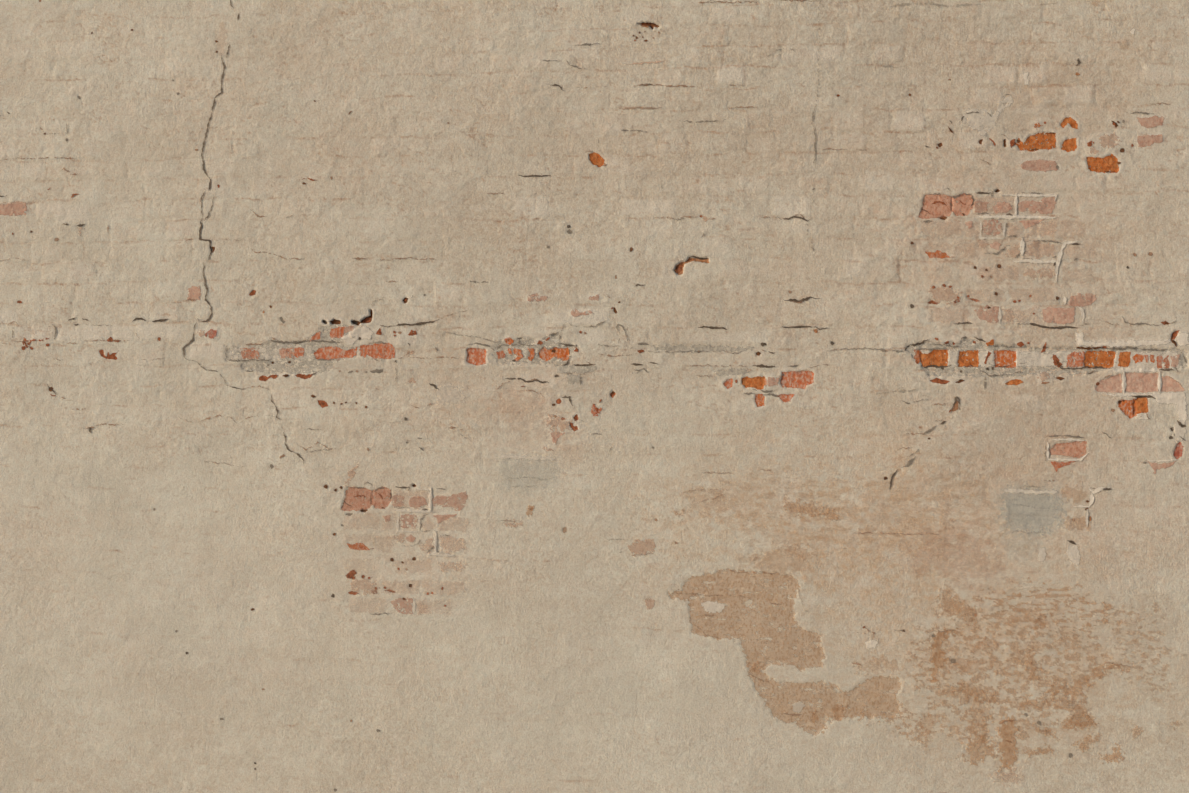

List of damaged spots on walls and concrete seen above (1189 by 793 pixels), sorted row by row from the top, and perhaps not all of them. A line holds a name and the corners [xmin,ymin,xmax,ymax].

peeling [948,94,1164,173]
crack [47,0,332,469]
peeling [910,242,950,259]
peeling [919,188,1080,282]
peeling [225,310,417,381]
peeling [466,332,596,367]
peeling [723,370,814,407]
peeling [896,284,1189,474]
peeling [1044,435,1088,481]
peeling [333,482,468,570]
peeling [346,570,443,615]